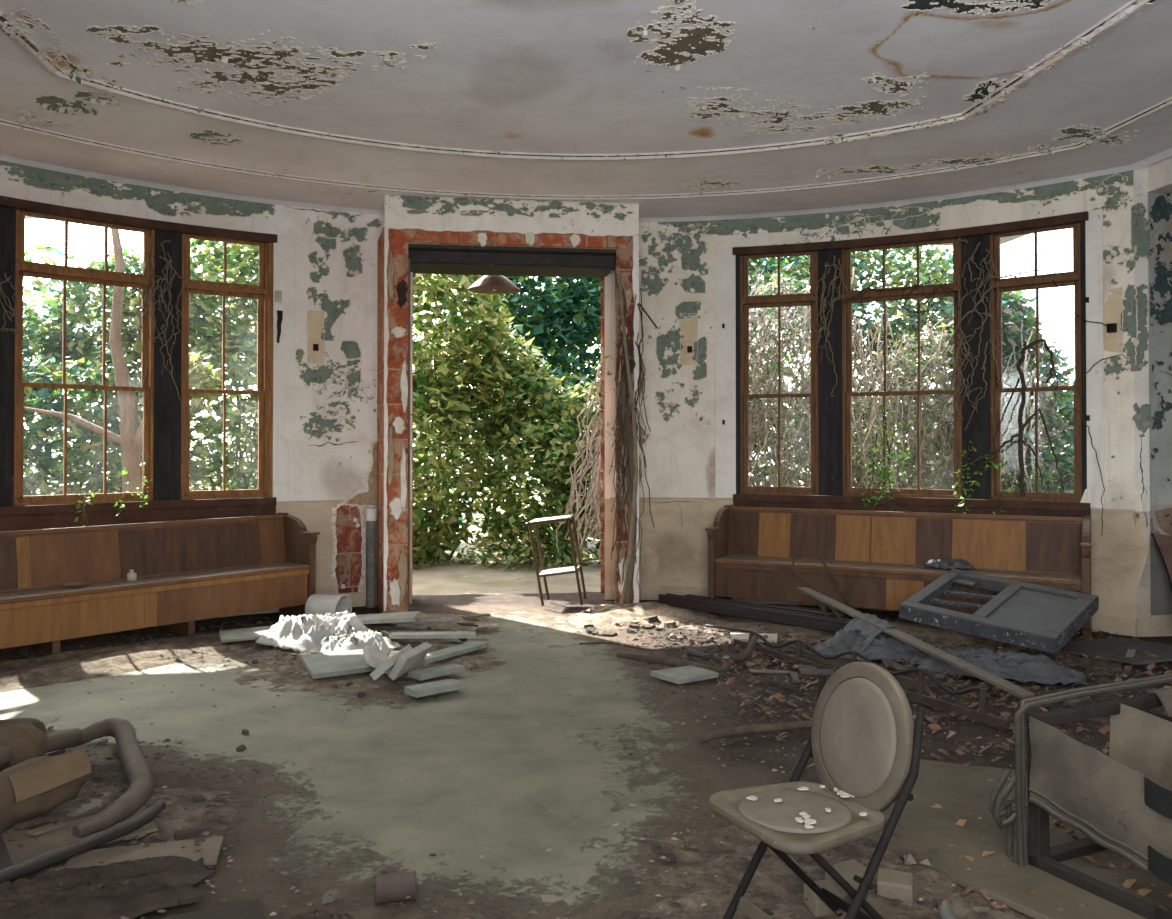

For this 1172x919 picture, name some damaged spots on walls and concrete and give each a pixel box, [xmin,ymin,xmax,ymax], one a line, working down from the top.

peeling [0,8,442,116]
peeling [625,0,737,71]
peeling [899,0,1053,16]
water stain [863,0,1141,82]
peeling [684,72,1030,145]
peeling [0,160,276,218]
peeling [400,196,634,221]
peeling [296,211,382,442]
peeling [639,170,1172,496]
spalling [331,439,377,602]
spalling [1133,504,1172,536]